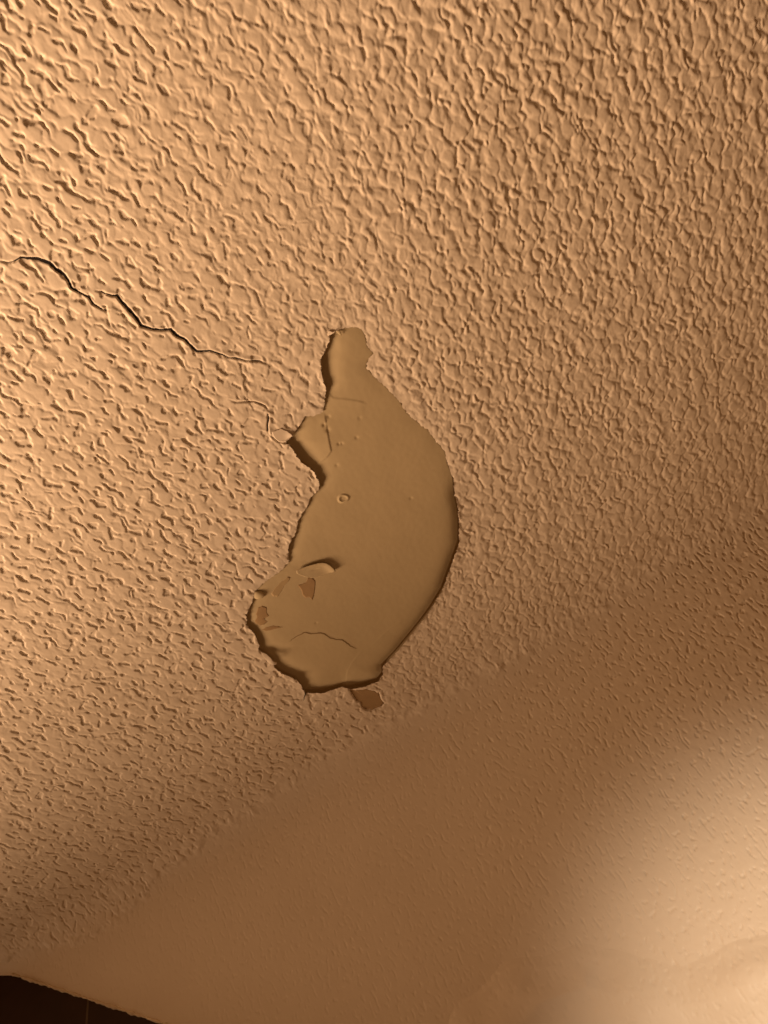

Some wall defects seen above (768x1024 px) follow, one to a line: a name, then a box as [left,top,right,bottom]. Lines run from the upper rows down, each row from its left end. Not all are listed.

crack [3,256,262,362]
peeling [245,327,460,709]